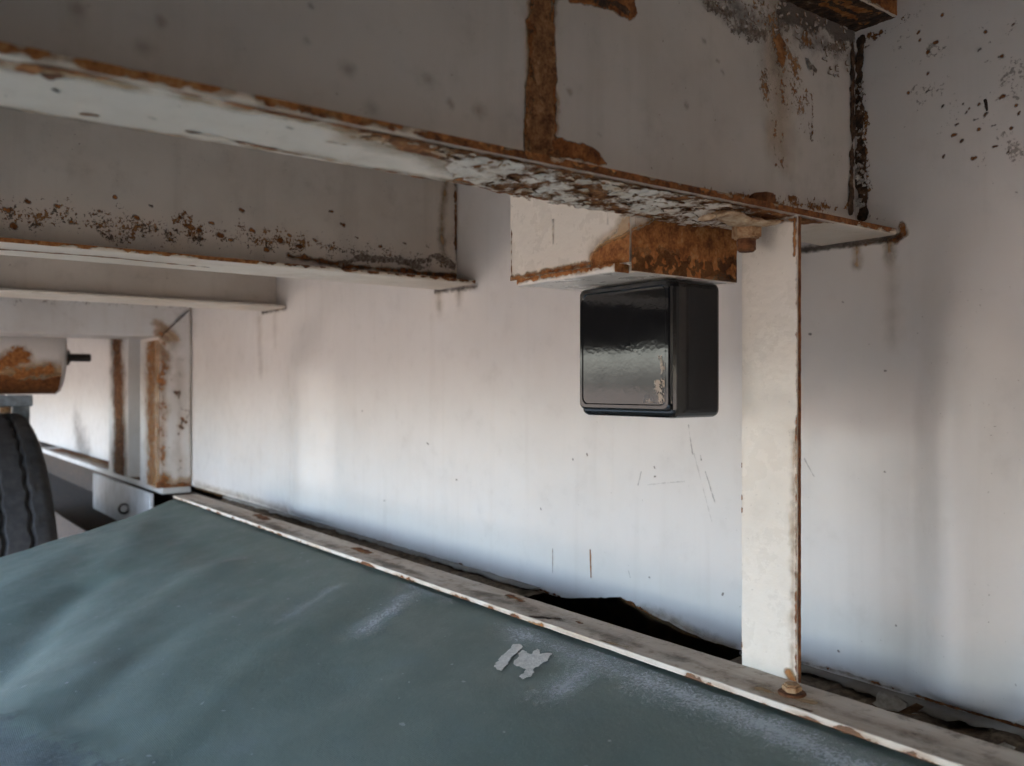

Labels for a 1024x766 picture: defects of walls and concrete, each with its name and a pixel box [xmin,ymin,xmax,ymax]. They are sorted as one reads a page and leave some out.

peeling [407,142,751,228]
corrosion [0,0,908,683]
corrosion [754,687,878,744]
corrosion [915,695,1024,729]